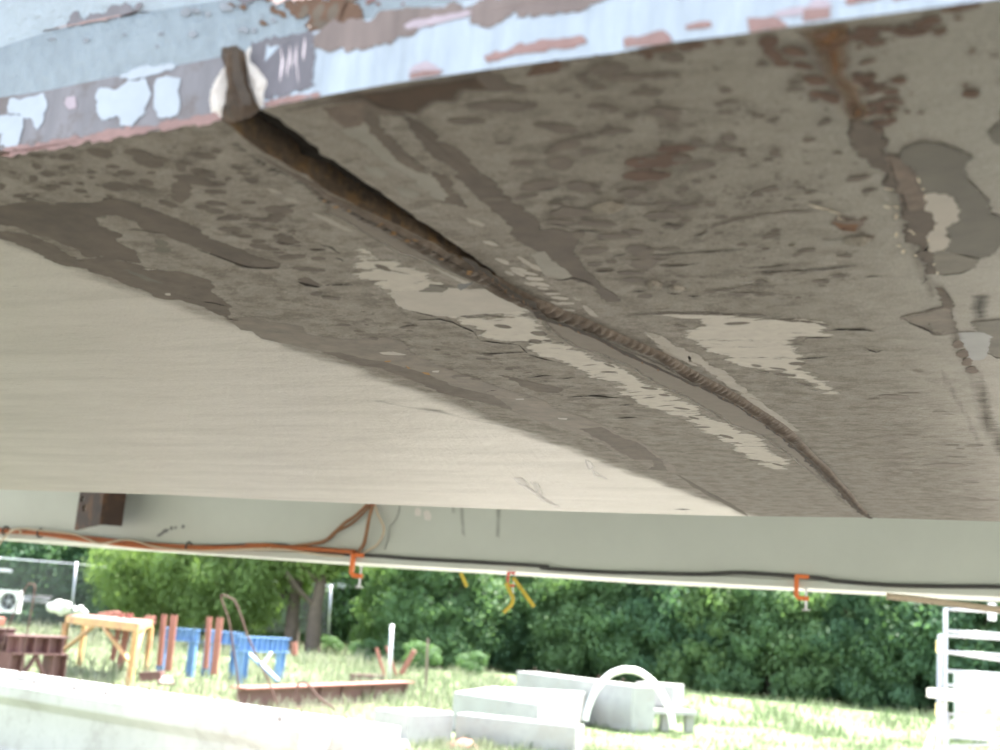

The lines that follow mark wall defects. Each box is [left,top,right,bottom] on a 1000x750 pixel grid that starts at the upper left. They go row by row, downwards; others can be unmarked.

peeling [43,2,149,40]
peeling [95,63,181,127]
peeling [238,0,859,318]
corrosion [623,30,723,60]
corrosion [685,21,711,30]
corrosion [747,0,939,285]
spalling [813,20,947,131]
water stain [327,203,461,276]
peeling [0,93,790,478]
peeling [900,142,1000,360]
water stain [546,321,824,481]
peeling [636,312,840,432]